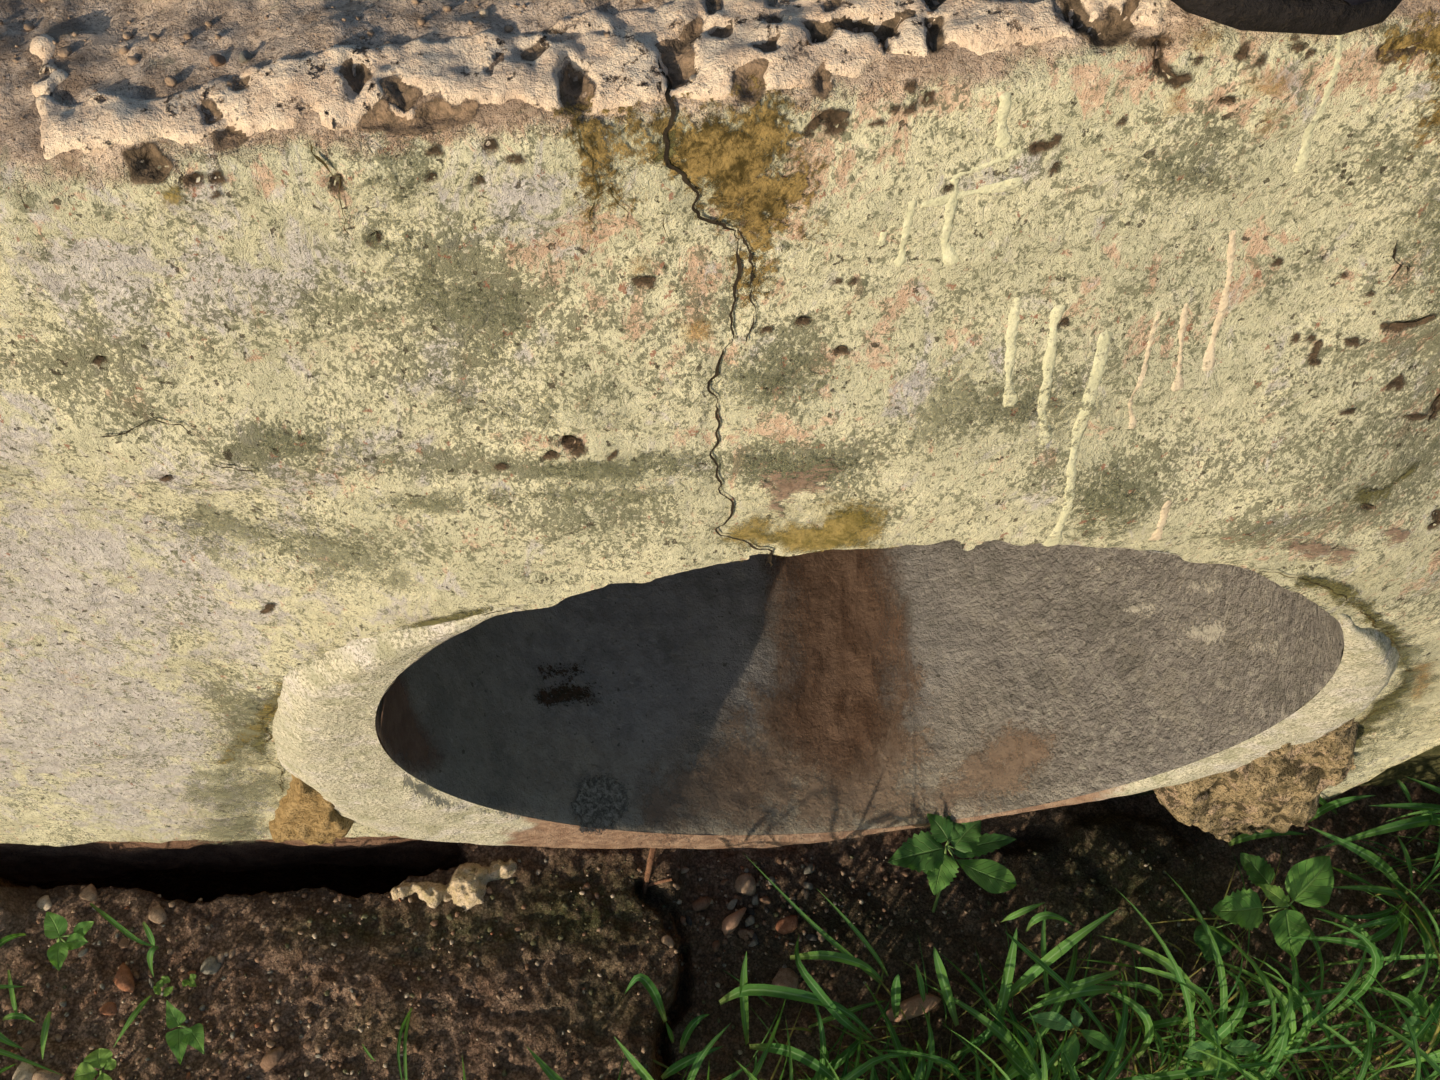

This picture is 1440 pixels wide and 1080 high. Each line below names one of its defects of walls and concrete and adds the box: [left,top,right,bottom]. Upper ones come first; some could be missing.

crack [574,58,773,567]